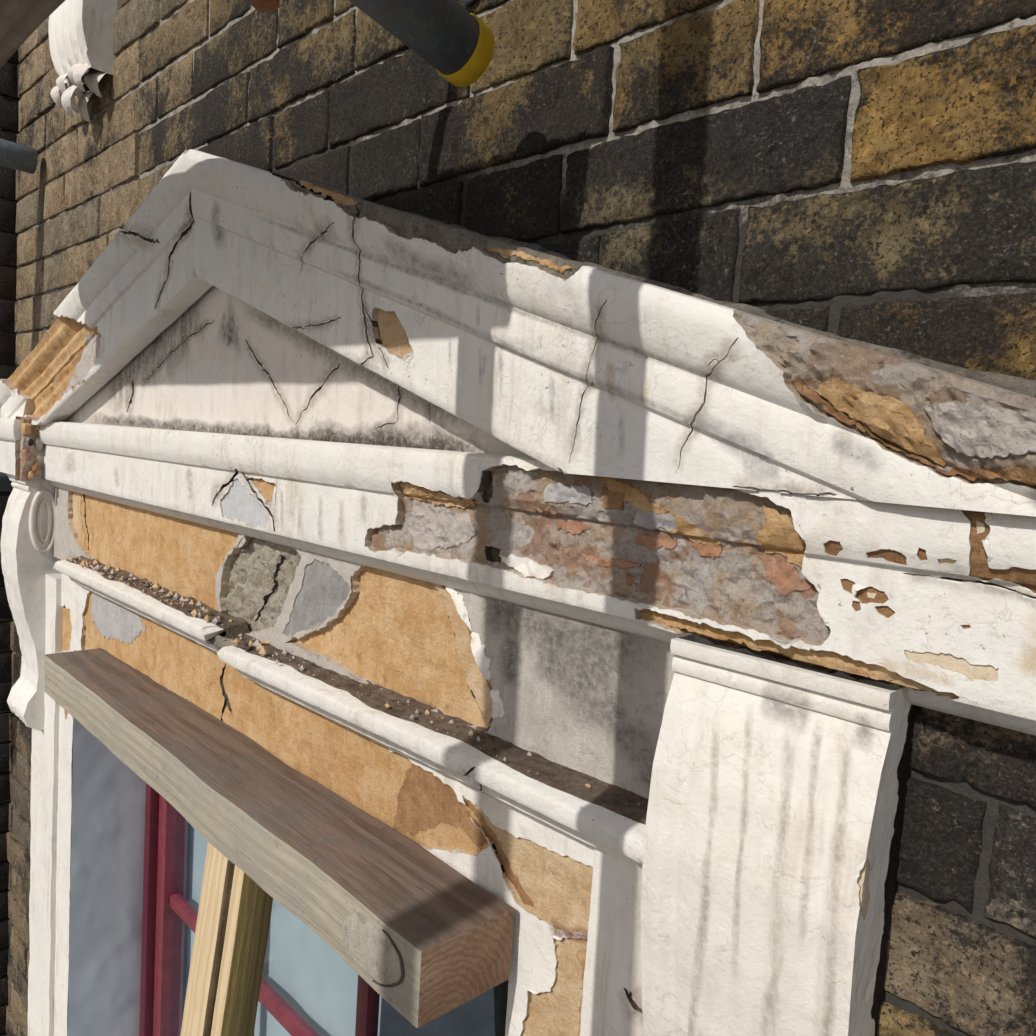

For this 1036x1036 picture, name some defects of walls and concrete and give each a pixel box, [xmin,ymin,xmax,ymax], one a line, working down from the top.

spalling [0,313,108,481]
crack [121,192,195,310]
crack [245,204,401,430]
crack [569,301,606,462]
crack [675,338,738,474]
spalling [733,310,1036,489]
crack [220,663,232,721]
spalling [68,477,505,733]
spalling [364,463,960,700]
peeling [866,510,1036,593]
spalling [62,591,593,1036]
peeling [871,704,915,1036]